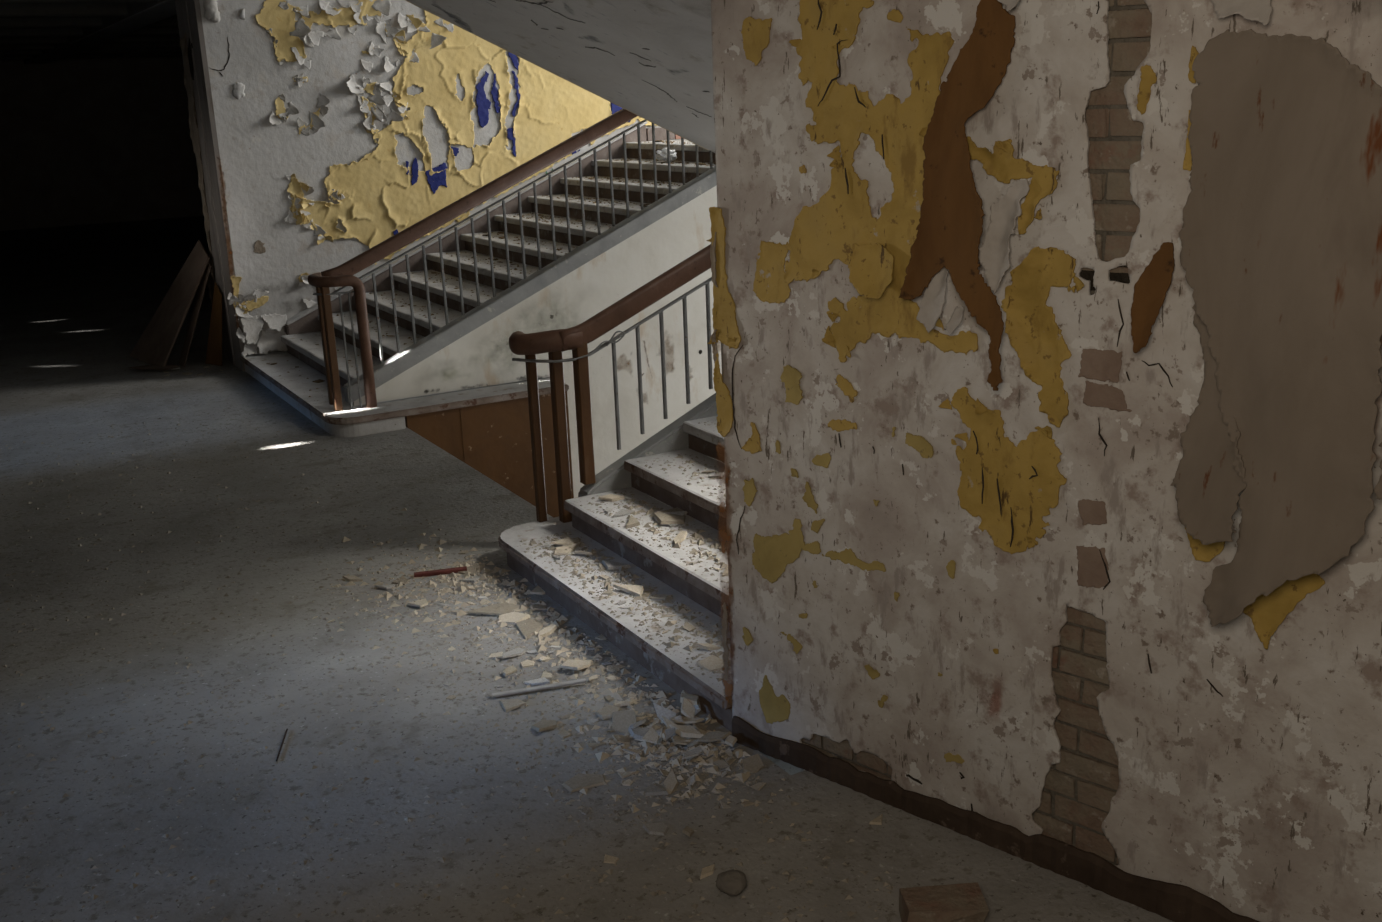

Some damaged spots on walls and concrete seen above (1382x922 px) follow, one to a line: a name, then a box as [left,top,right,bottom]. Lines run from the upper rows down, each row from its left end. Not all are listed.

peeling [179,33,269,318]
peeling [297,273,336,309]
peeling [255,0,658,265]
peeling [784,0,1382,649]
flaking render [1034,606,1120,865]